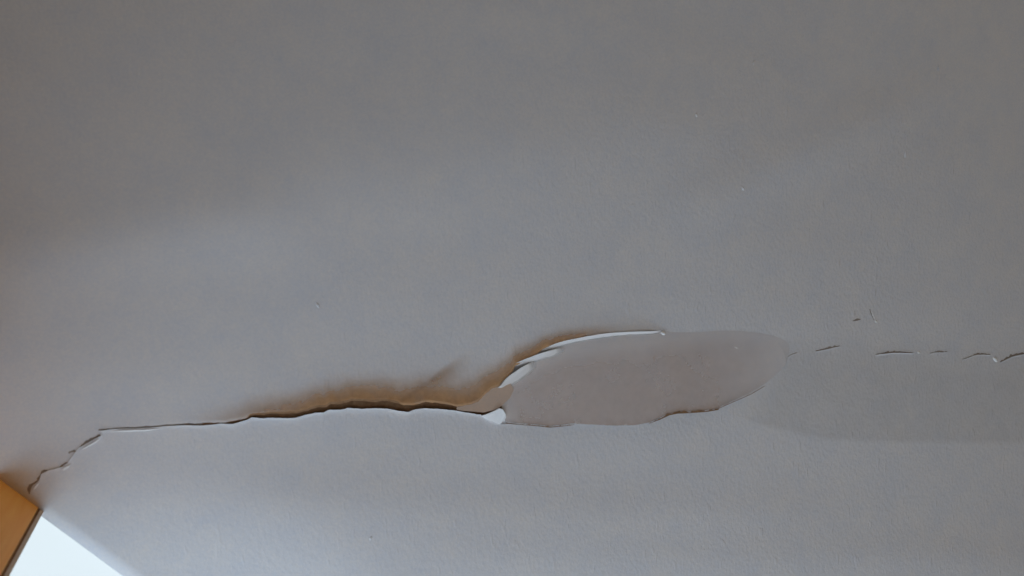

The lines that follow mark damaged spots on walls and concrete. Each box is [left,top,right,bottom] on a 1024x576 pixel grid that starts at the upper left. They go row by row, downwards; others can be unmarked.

leakage [267,334,585,412]
peeling [457,330,790,428]
crack [875,351,1024,365]
crack [27,401,526,497]